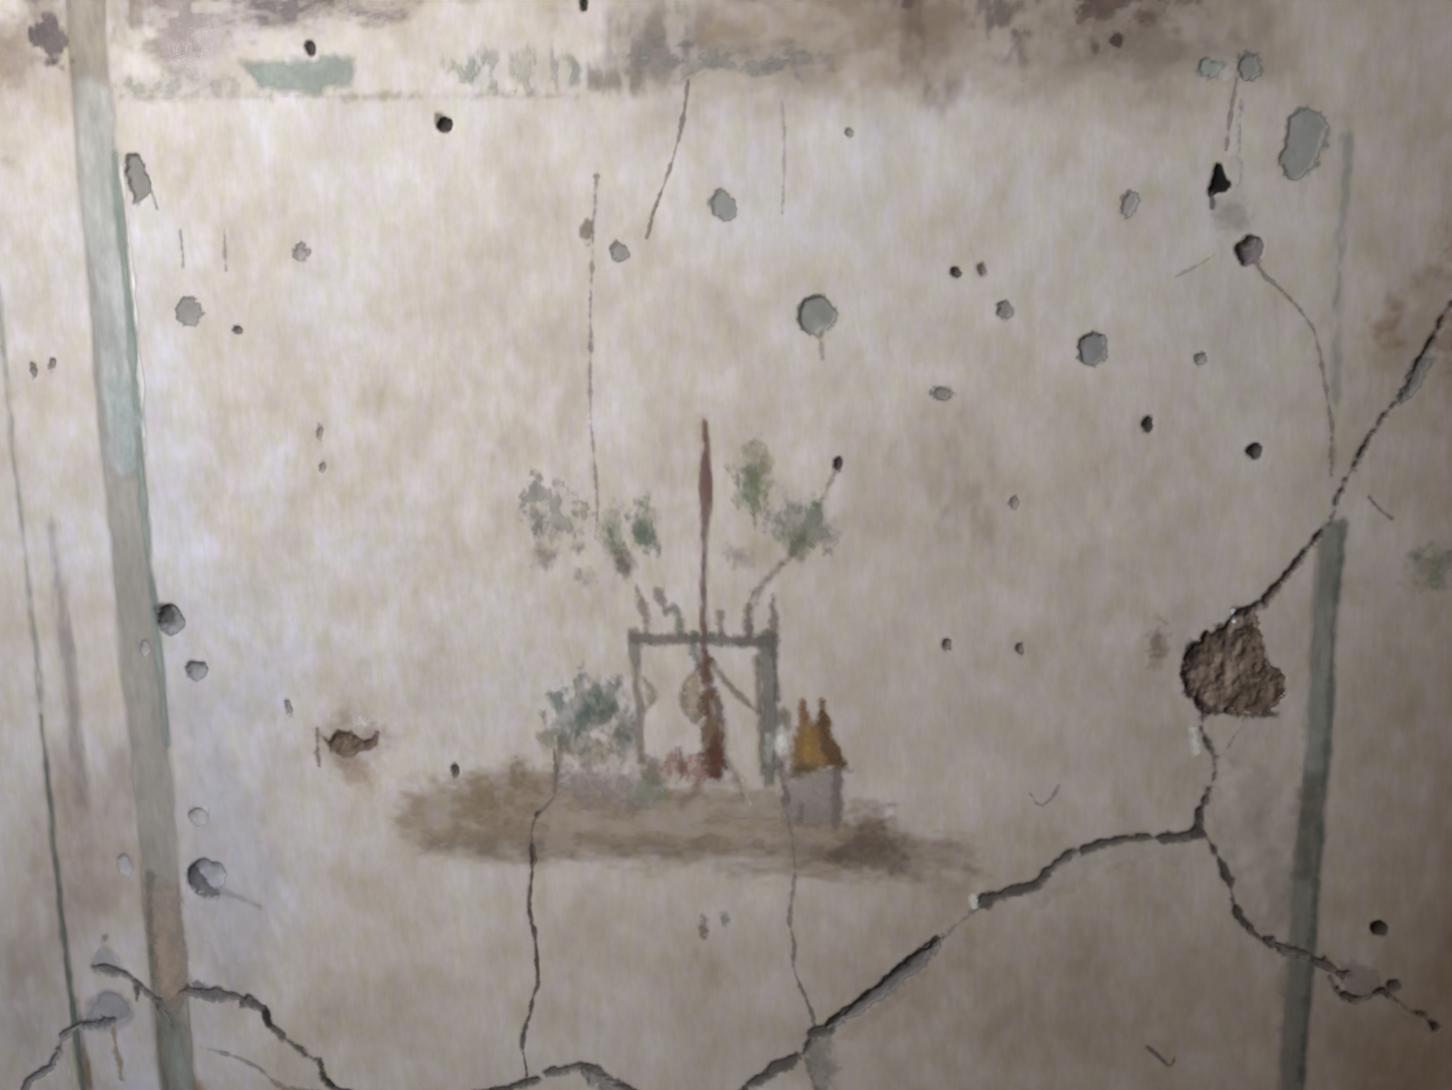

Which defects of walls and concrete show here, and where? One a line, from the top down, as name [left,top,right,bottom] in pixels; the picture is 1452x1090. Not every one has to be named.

water stain [128,0,404,59]
water stain [639,41,811,75]
water stain [979,0,1019,36]
water stain [1076,0,1167,52]
spalling [1279,107,1329,180]
spalling [125,153,157,208]
spalling [1180,606,1286,717]
spalling [314,719,378,766]
crack [969,713,1439,1031]
crack [489,754,635,1090]
crack [21,935,349,1090]
crack [742,875,944,1090]